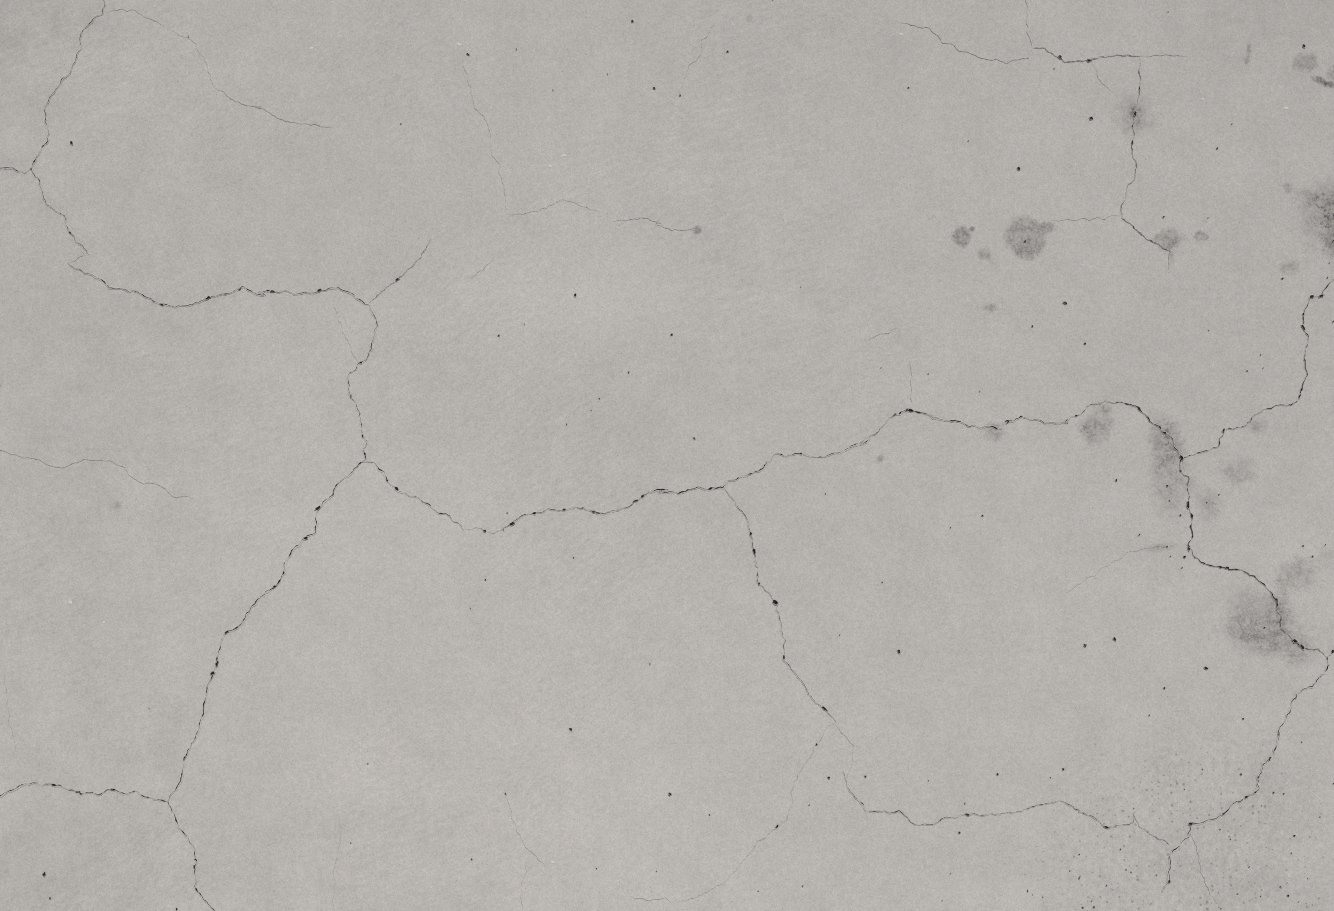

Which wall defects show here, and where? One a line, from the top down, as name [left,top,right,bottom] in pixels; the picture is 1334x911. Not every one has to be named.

crack [0,0,464,911]
crack [463,66,688,230]
crack [476,279,1334,905]
crack [900,0,1183,263]